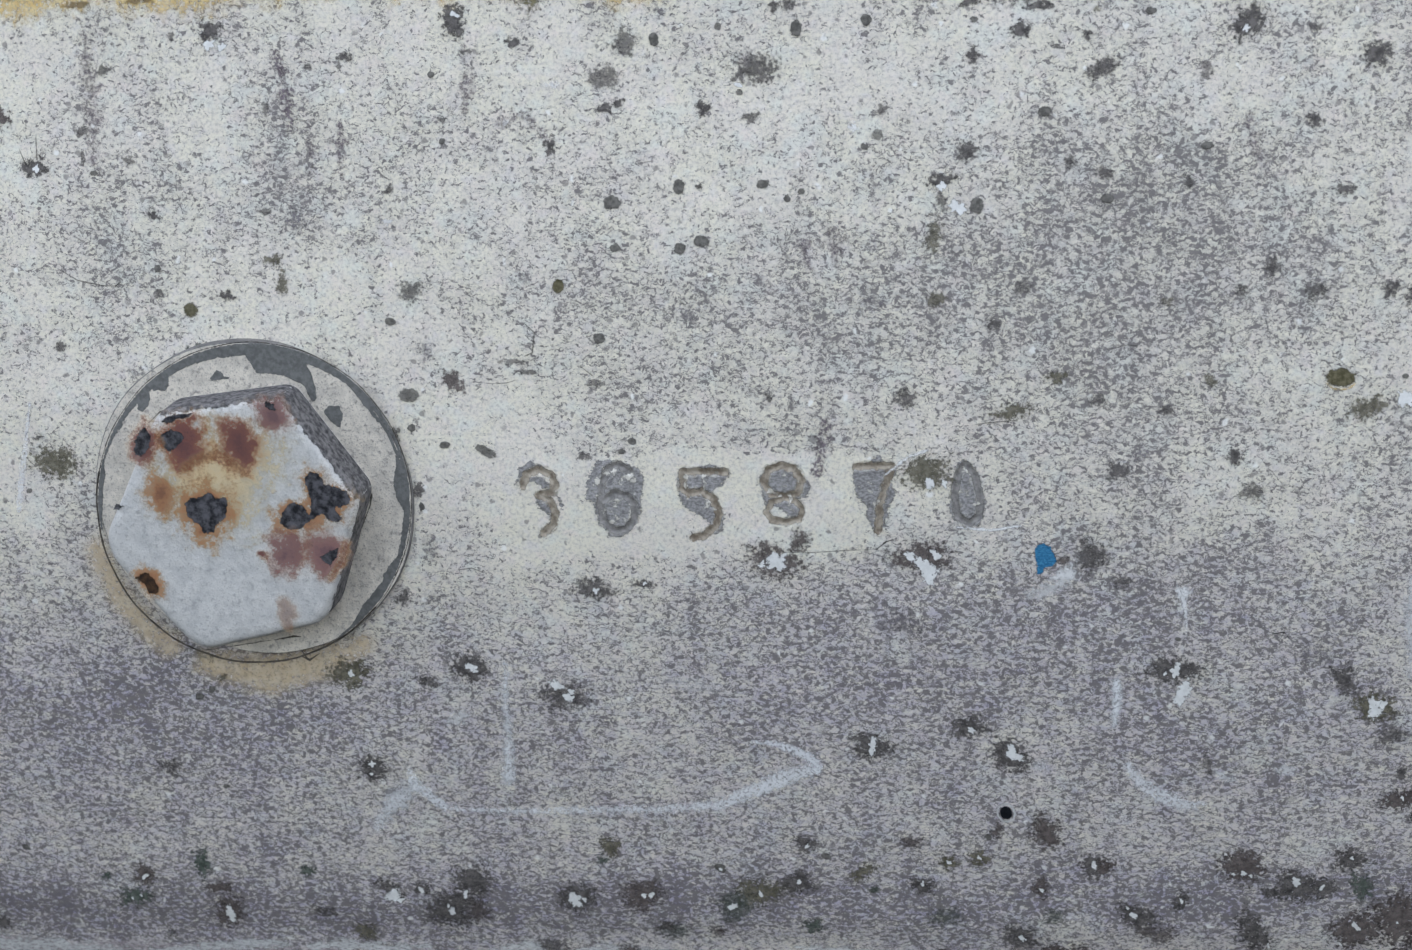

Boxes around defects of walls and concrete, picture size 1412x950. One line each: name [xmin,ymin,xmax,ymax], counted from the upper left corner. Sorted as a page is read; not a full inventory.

rust [129,396,353,579]
rust [133,567,165,598]